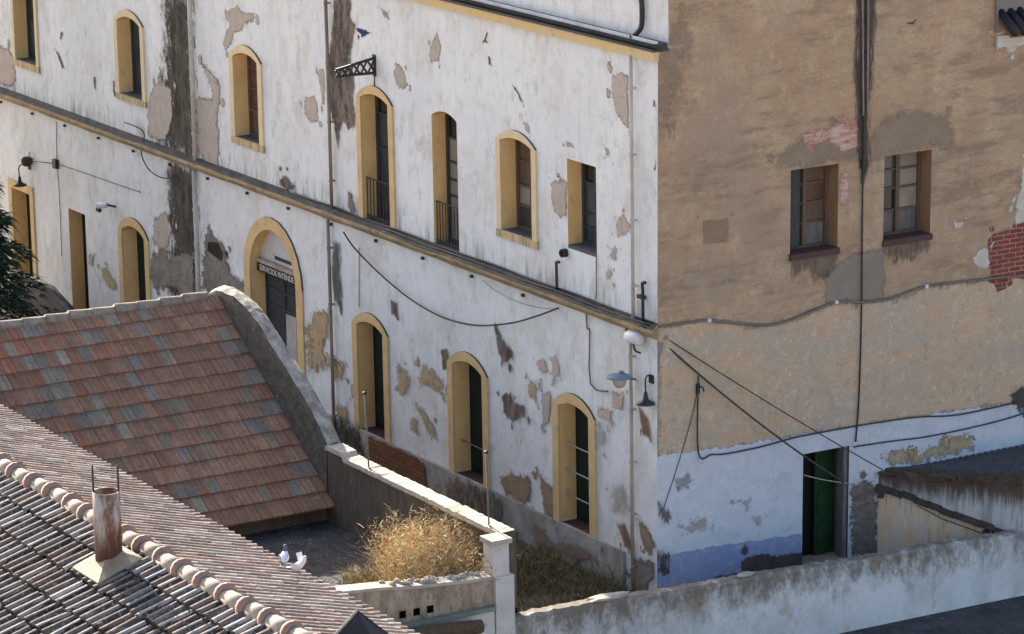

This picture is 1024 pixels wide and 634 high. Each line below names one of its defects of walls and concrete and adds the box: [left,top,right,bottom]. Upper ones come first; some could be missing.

peeling [146,67,176,142]
water stain [157,0,200,296]
peeling [195,55,224,165]
water stain [329,0,356,146]
peeling [606,61,630,136]
spalling [803,109,861,153]
water stain [853,0,877,182]
flaking render [973,154,1024,292]
peeling [394,348,448,403]
peeling [497,356,559,433]
peeling [881,434,976,466]
peeling [500,465,553,518]